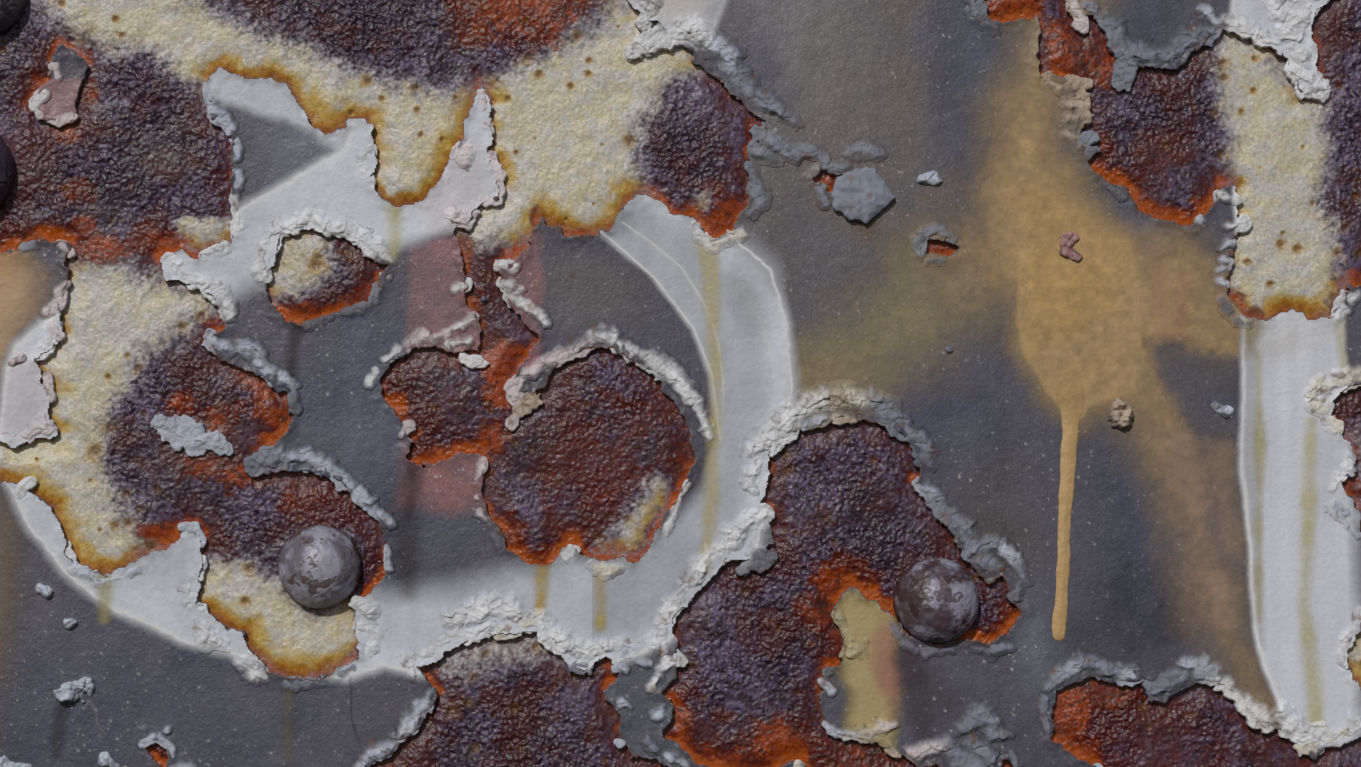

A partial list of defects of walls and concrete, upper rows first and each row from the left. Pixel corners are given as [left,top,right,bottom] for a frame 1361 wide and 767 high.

peeling [1059,231,1083,262]
corrosion [962,0,1361,340]
corrosion [0,0,1033,767]
corrosion [1301,360,1361,544]
corrosion [1036,647,1361,767]
corrosion [1335,603,1361,689]